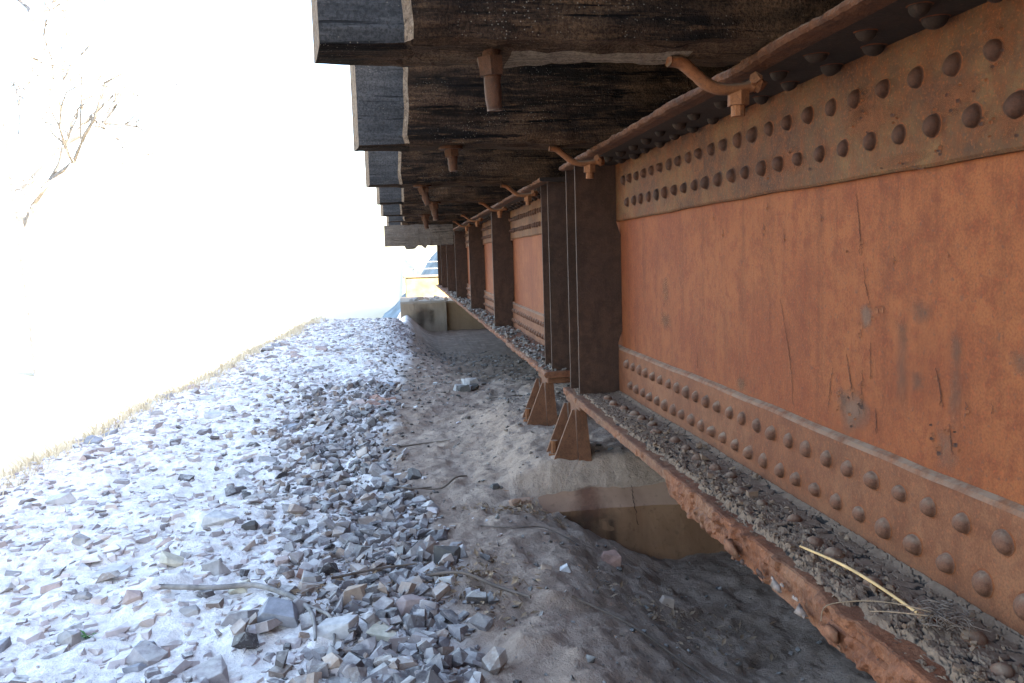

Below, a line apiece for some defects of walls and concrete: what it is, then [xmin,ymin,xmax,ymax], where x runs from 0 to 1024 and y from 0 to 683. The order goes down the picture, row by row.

rust [723,534,741,560]
rust [770,576,808,619]
rust [818,623,843,652]